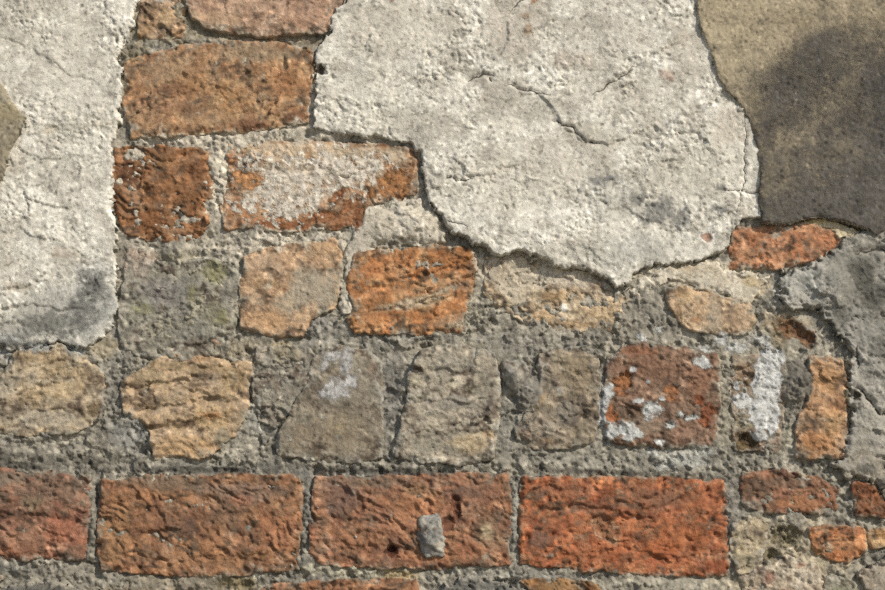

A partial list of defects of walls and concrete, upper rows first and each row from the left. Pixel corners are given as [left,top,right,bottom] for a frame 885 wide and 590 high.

crack [468,73,549,95]
peeling [695,0,747,115]
peeling [105,0,140,230]
crack [554,121,600,144]
water stain [751,28,885,236]
spalling [230,144,413,230]
peeling [448,226,636,287]
water stain [693,331,771,369]
spalling [775,317,818,349]
water stain [597,383,666,445]
water stain [666,411,699,429]
water stain [643,439,715,471]